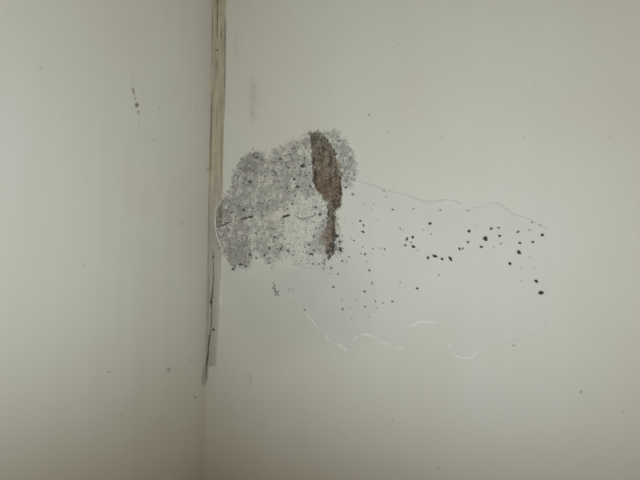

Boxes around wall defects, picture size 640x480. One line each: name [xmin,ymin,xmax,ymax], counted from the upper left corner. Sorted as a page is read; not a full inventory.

corrosion [309,130,343,259]
crack [206,256,215,372]